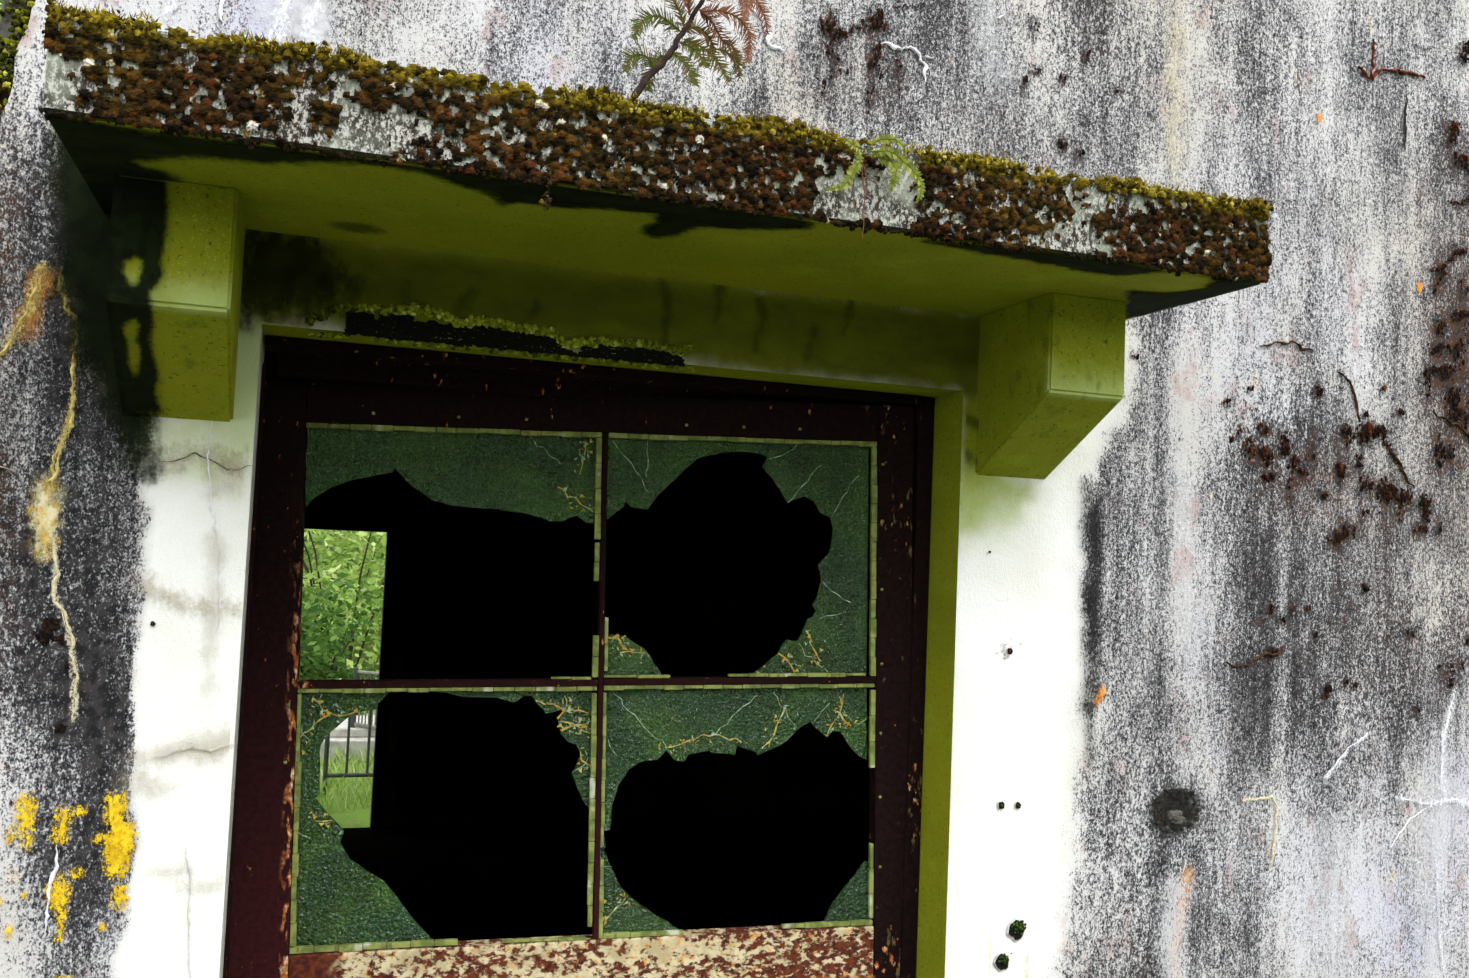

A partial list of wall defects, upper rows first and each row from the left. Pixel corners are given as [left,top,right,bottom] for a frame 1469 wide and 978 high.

damp [43,118,814,483]
damp [922,240,1260,320]
crack [1433,410,1469,436]
damp [28,482,60,556]
damp [1078,473,1106,765]
crack [1324,731,1370,796]
crack [1391,688,1469,847]
damp [1154,871,1194,978]
crack [1435,864,1445,969]